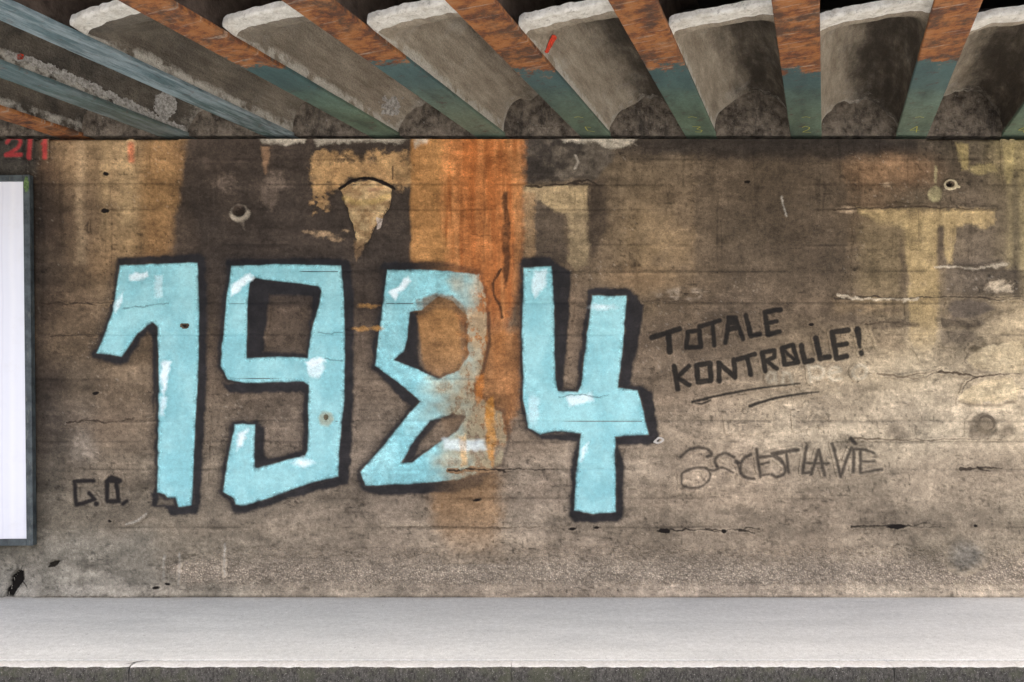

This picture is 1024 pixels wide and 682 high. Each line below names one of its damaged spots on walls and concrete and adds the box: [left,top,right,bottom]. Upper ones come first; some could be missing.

peeling [257,140,273,177]
peeling [296,144,418,265]
corrosion [407,139,533,470]
crack [874,365,1024,395]
corrosion [421,475,516,564]